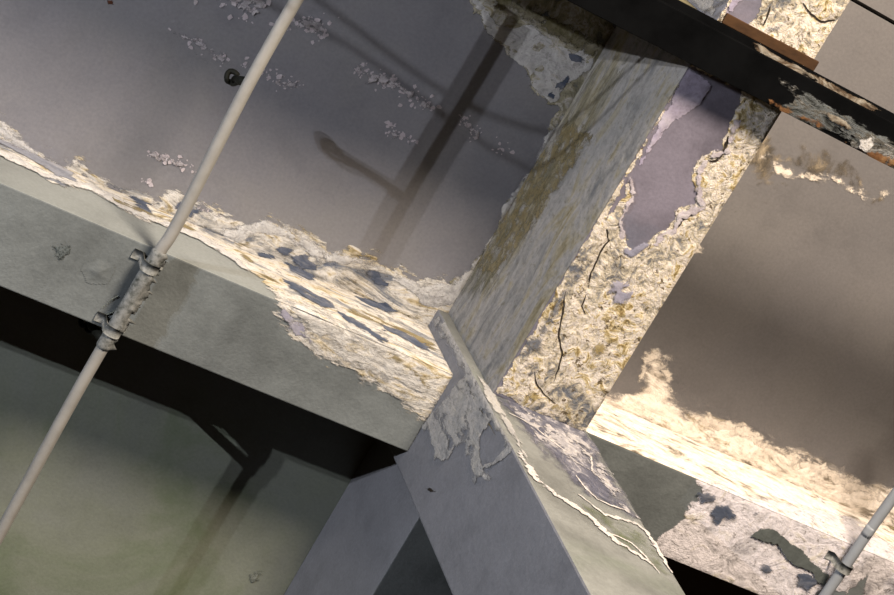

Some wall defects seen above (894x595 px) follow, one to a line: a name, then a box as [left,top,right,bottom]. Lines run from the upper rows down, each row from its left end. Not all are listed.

peeling [718,0,742,23]
spalling [749,0,850,68]
peeling [353,63,442,111]
corrosion [769,81,894,169]
damp [0,121,185,227]
peeling [147,150,197,173]
damp [180,0,893,527]
spalling [496,64,782,431]
peeling [656,473,864,595]
peeling [836,534,894,595]
damp [874,507,894,547]